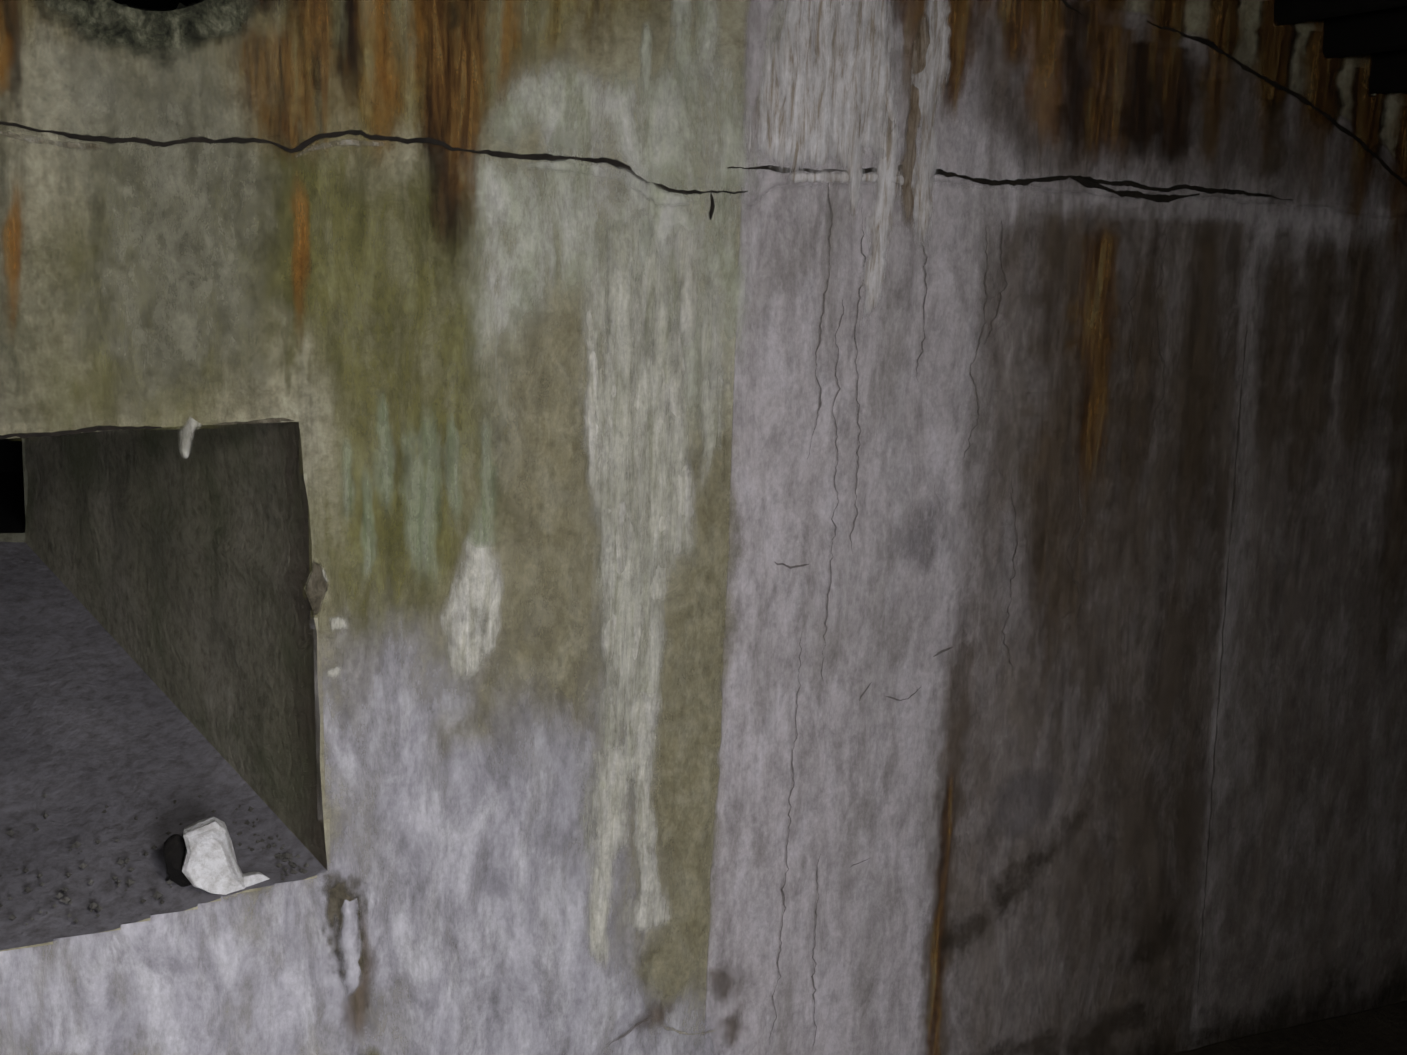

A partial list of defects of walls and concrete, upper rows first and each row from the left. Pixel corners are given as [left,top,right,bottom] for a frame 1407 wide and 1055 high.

corrosion [0,0,46,81]
corrosion [250,0,648,241]
corrosion [888,0,981,104]
corrosion [998,0,1241,159]
crack [1147,21,1407,187]
corrosion [1257,0,1407,236]
corrosion [5,204,21,289]
corrosion [294,190,308,290]
leakage [463,0,950,961]
leakage [442,530,501,676]
crack [0,121,1293,1035]
corrosion [927,725,963,1055]